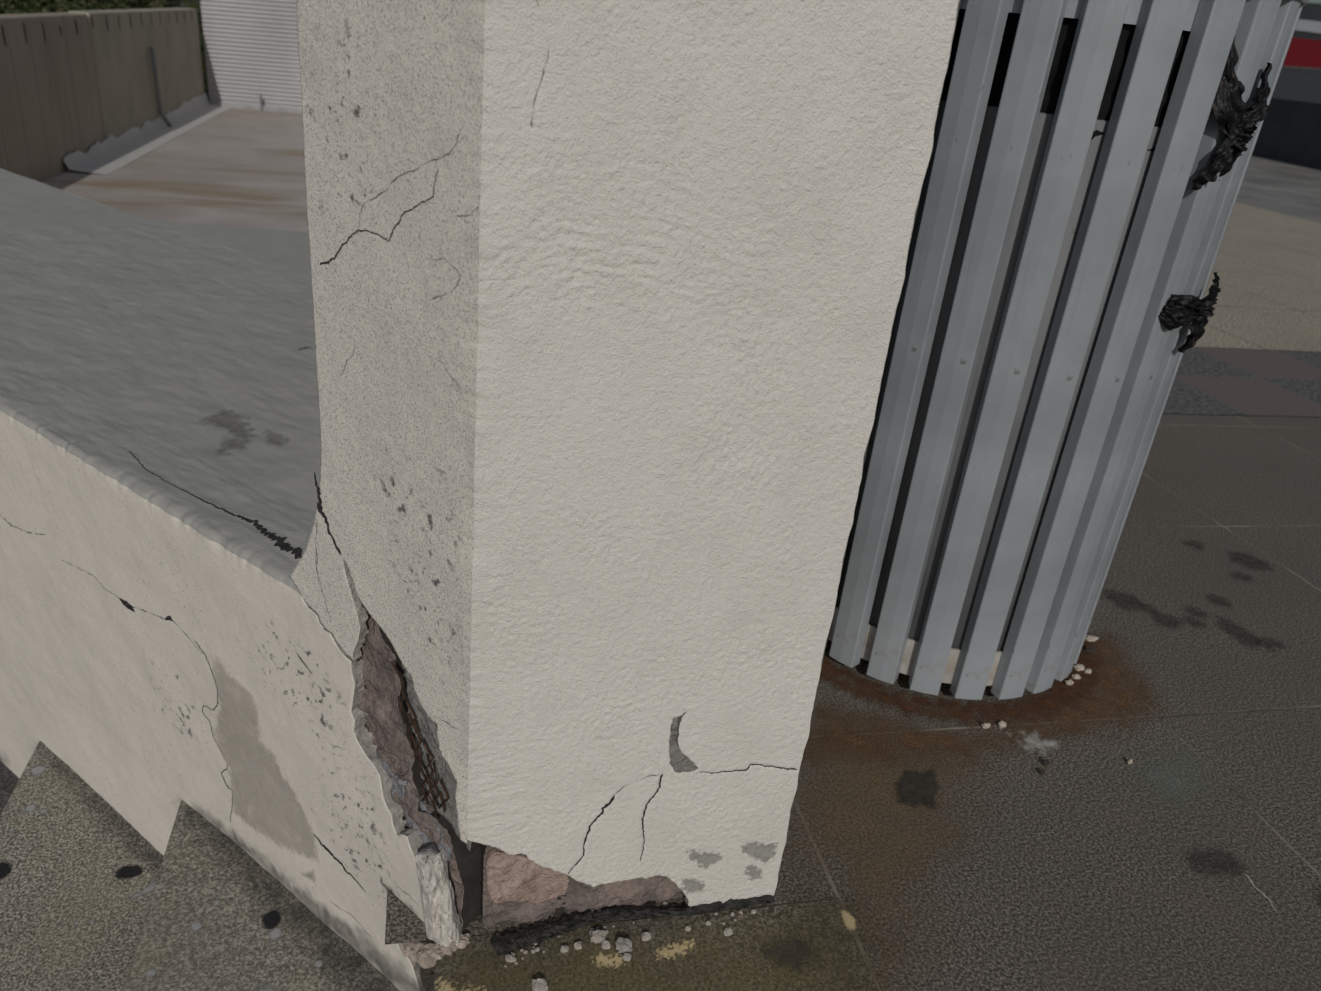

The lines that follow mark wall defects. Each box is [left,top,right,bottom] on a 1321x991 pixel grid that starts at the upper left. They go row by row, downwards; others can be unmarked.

crack [320,126,479,265]
crack [129,451,341,623]
crack [0,515,233,822]
corrosion [820,633,1100,725]
spalling [358,604,722,937]
crack [568,774,663,874]
crack [700,764,797,774]